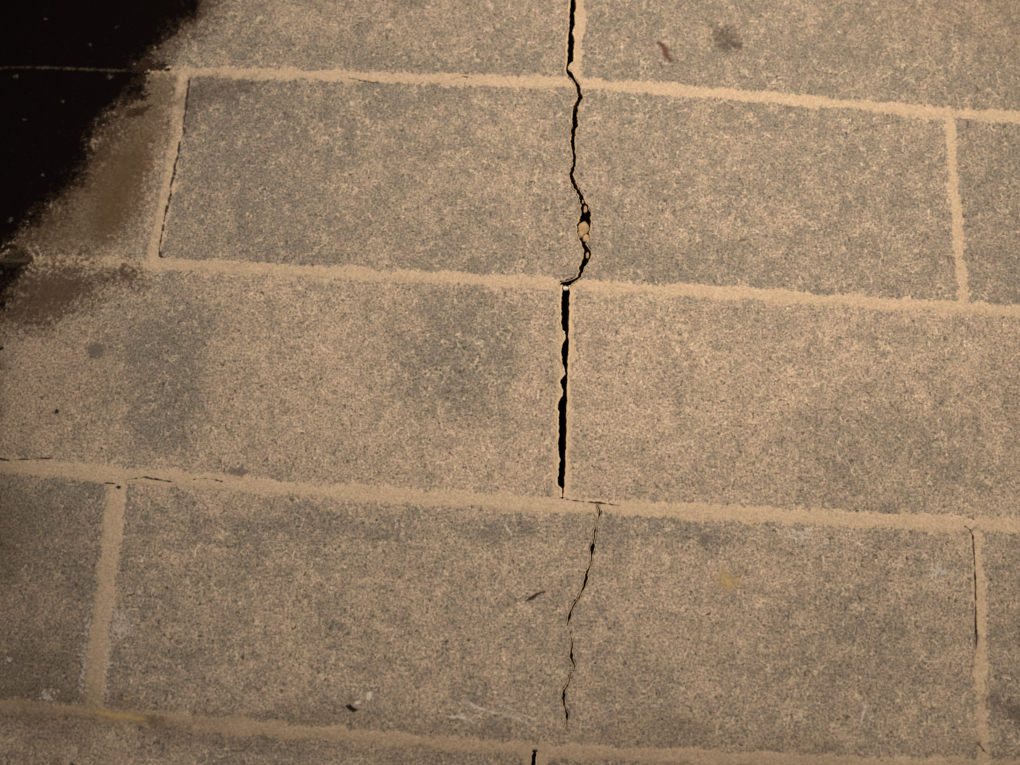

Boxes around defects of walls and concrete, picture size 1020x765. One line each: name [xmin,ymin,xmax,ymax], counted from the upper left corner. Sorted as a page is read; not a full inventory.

crack [554,0,616,734]
crack [530,752,538,765]